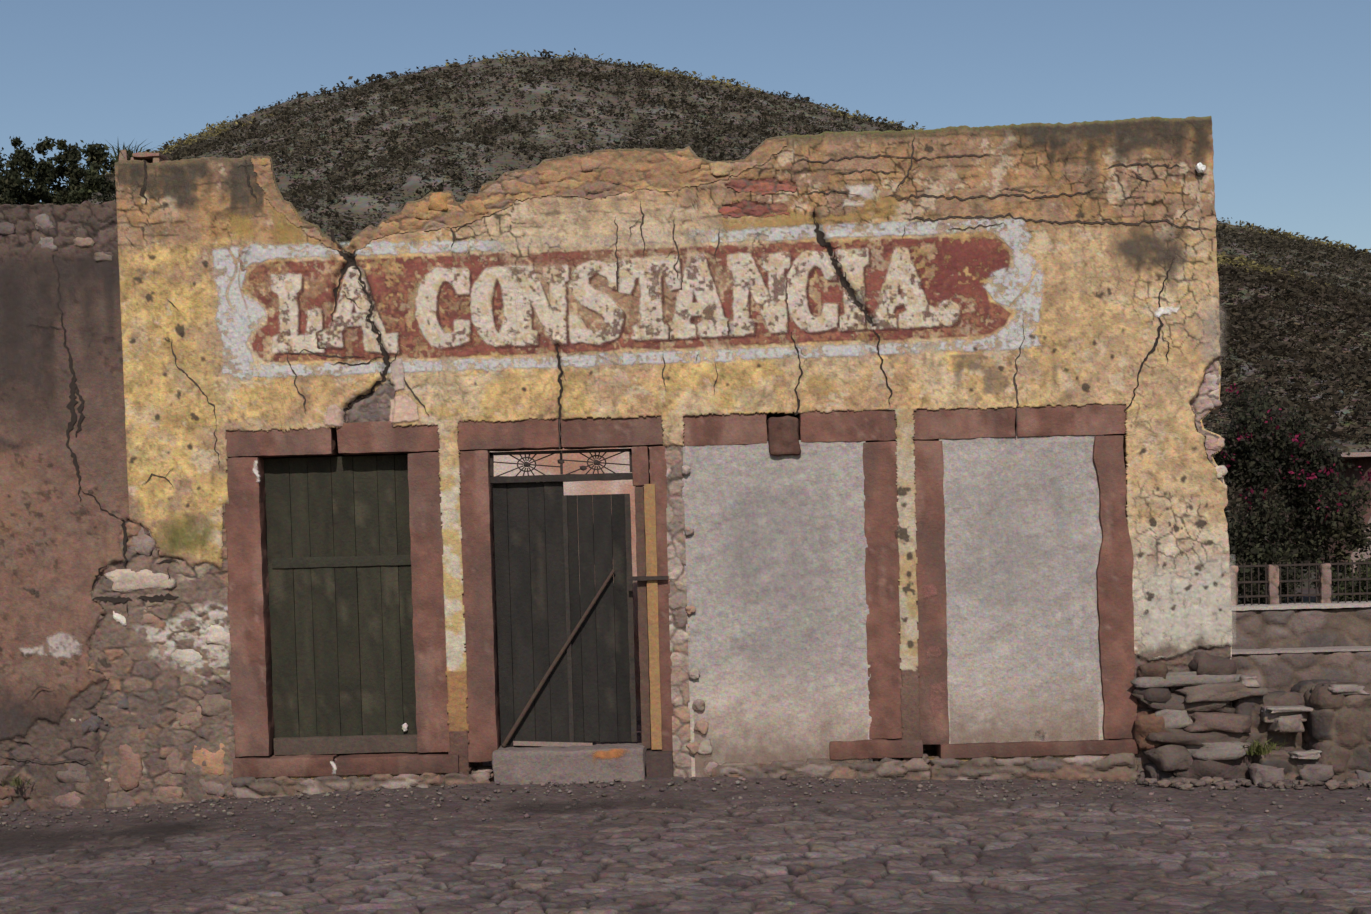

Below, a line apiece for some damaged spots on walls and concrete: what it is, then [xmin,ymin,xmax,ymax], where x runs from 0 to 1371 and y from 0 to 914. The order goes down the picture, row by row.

crack [28,254,179,617]
crack [286,229,429,423]
spalling [325,358,419,426]
crack [555,346,566,449]
crack [794,137,1212,410]
crack [1013,320,1025,436]
leakage [1117,232,1184,269]
spalling [1189,360,1228,483]
flaking render [1139,487,1213,557]
spalling [0,504,235,813]